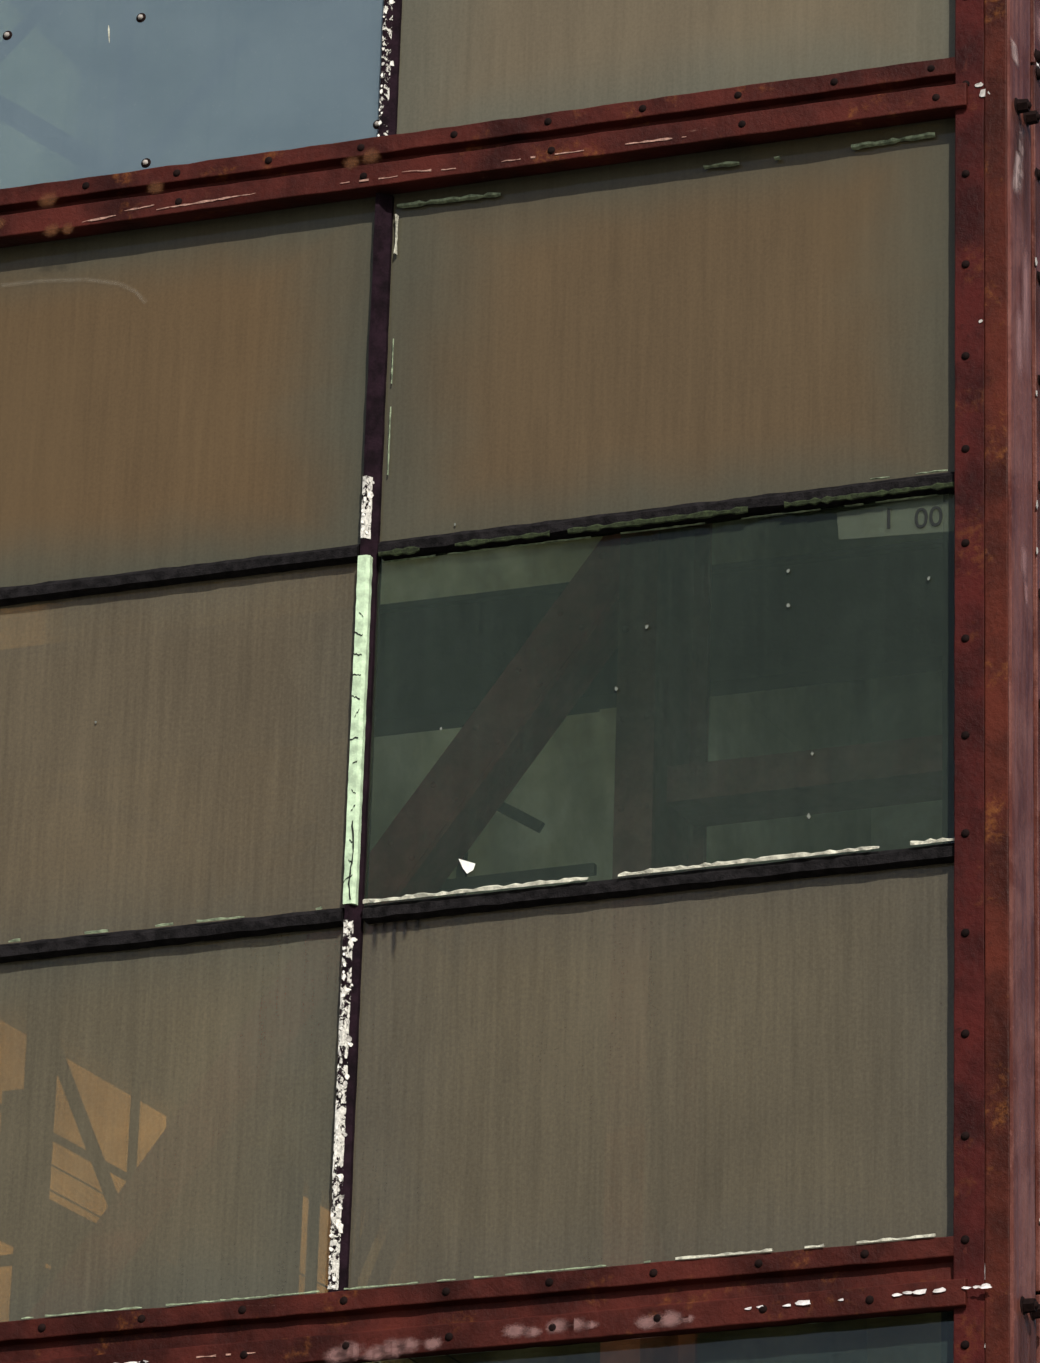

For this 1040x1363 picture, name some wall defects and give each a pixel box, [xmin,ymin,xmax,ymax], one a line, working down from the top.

peeling [377,0,395,137]
corrosion [1014,111,1040,232]
peeling [360,476,374,539]
peeling [327,920,357,1290]
peeling [892,1287,946,1297]